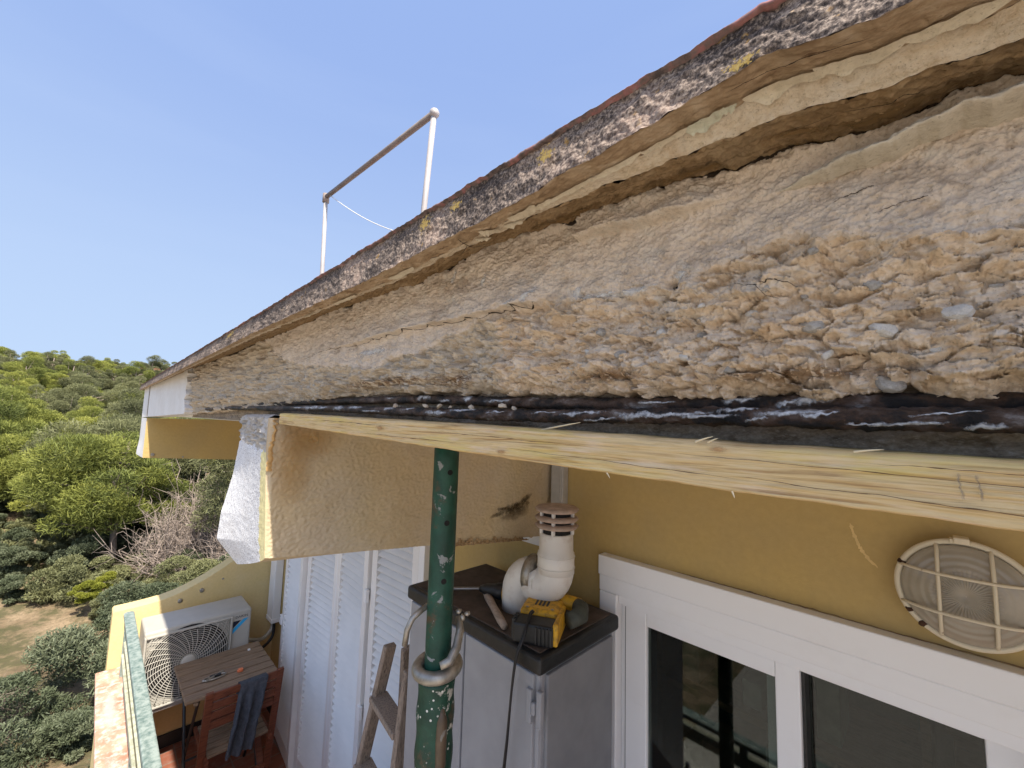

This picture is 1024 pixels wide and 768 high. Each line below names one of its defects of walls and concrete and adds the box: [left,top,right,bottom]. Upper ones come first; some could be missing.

peeling [475,0,1011,242]
crack [693,84,982,179]
crack [314,303,534,355]
efflorescence [535,397,836,421]
efflorescence [852,410,978,427]
damp [496,496,528,516]